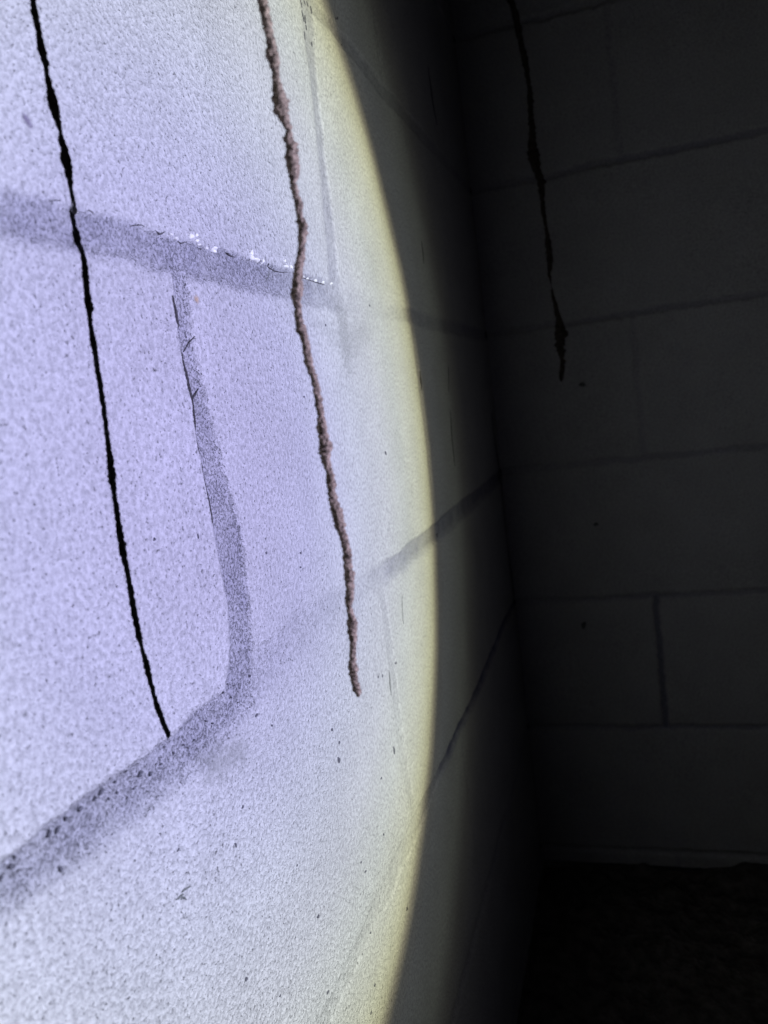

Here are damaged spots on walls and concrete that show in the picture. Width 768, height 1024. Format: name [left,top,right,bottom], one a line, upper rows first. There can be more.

crack [130,224,234,257]
crack [266,263,324,285]